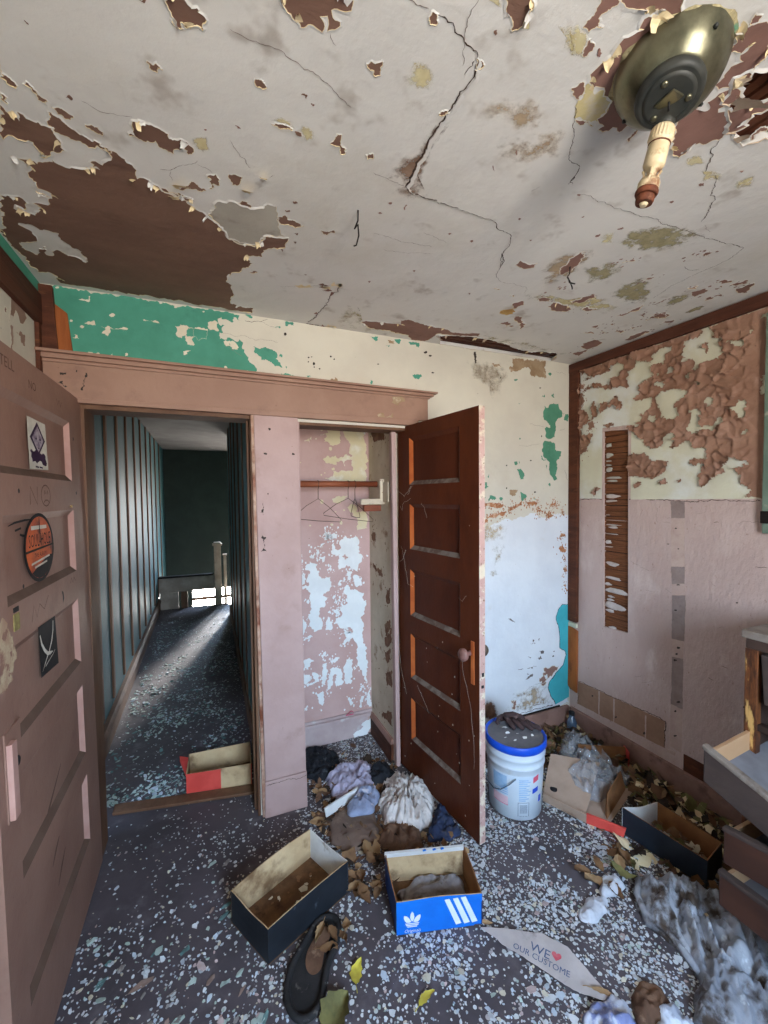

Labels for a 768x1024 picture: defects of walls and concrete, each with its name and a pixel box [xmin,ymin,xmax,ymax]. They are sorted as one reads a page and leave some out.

peeling [0,65,304,376]
peeling [163,0,209,33]
peeling [279,0,357,34]
crack [375,0,527,289]
peeling [570,0,686,142]
crack [569,109,744,297]
peeling [669,12,768,159]
peeling [682,279,756,301]
peeling [304,430,385,481]
peeling [361,299,768,523]
peeling [302,495,398,771]
flaking render [518,604,569,705]